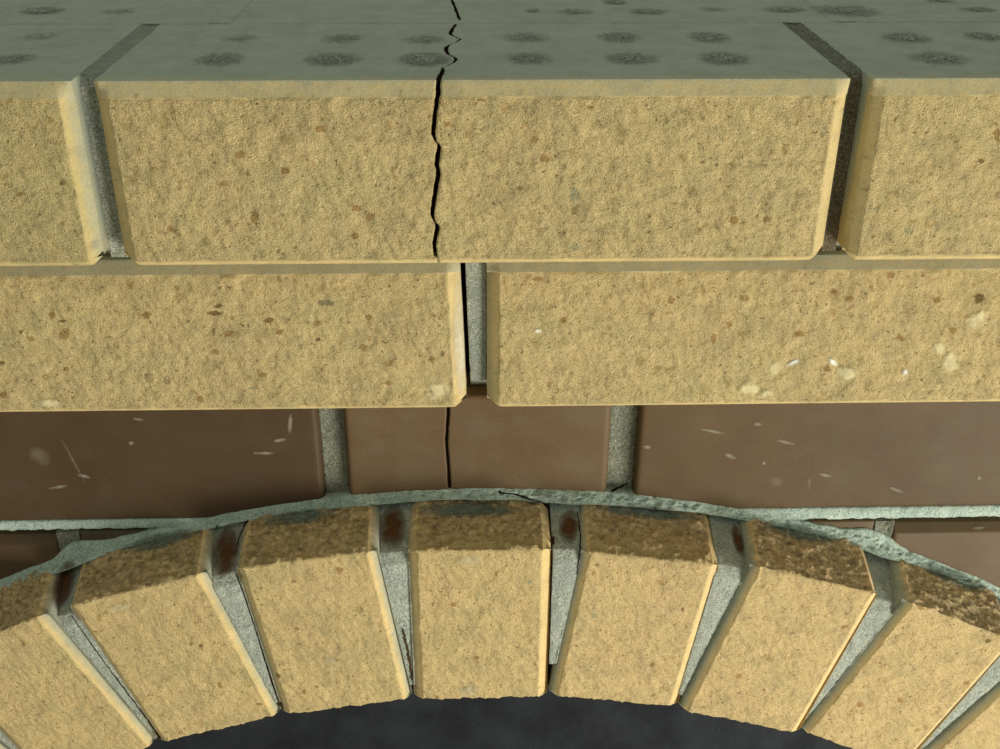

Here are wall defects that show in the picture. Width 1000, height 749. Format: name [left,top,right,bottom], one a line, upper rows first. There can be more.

crack [430,0,462,256]
crack [444,407,452,488]
rust [382,511,404,543]
rust [561,516,578,539]
rust [733,528,743,552]
crack [499,491,555,685]